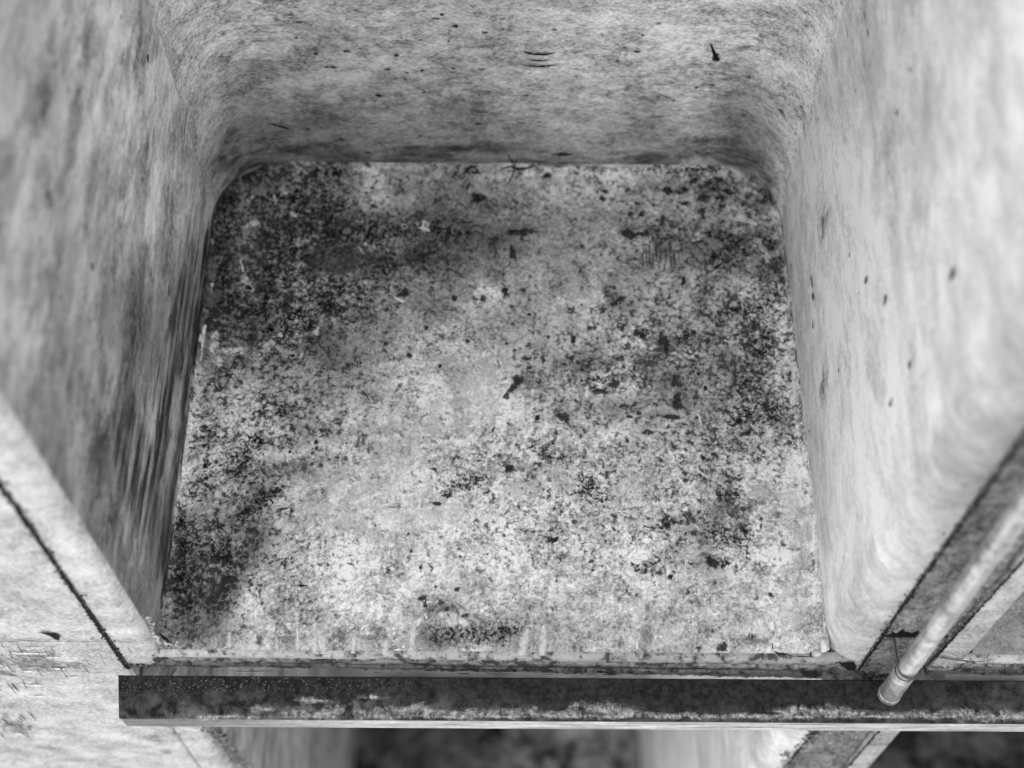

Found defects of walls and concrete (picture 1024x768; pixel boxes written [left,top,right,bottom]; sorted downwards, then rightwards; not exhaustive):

damp [506,224,546,261]
damp [554,281,627,343]
damp [620,182,801,447]
damp [90,164,532,625]
damp [568,322,702,420]
damp [273,628,326,654]